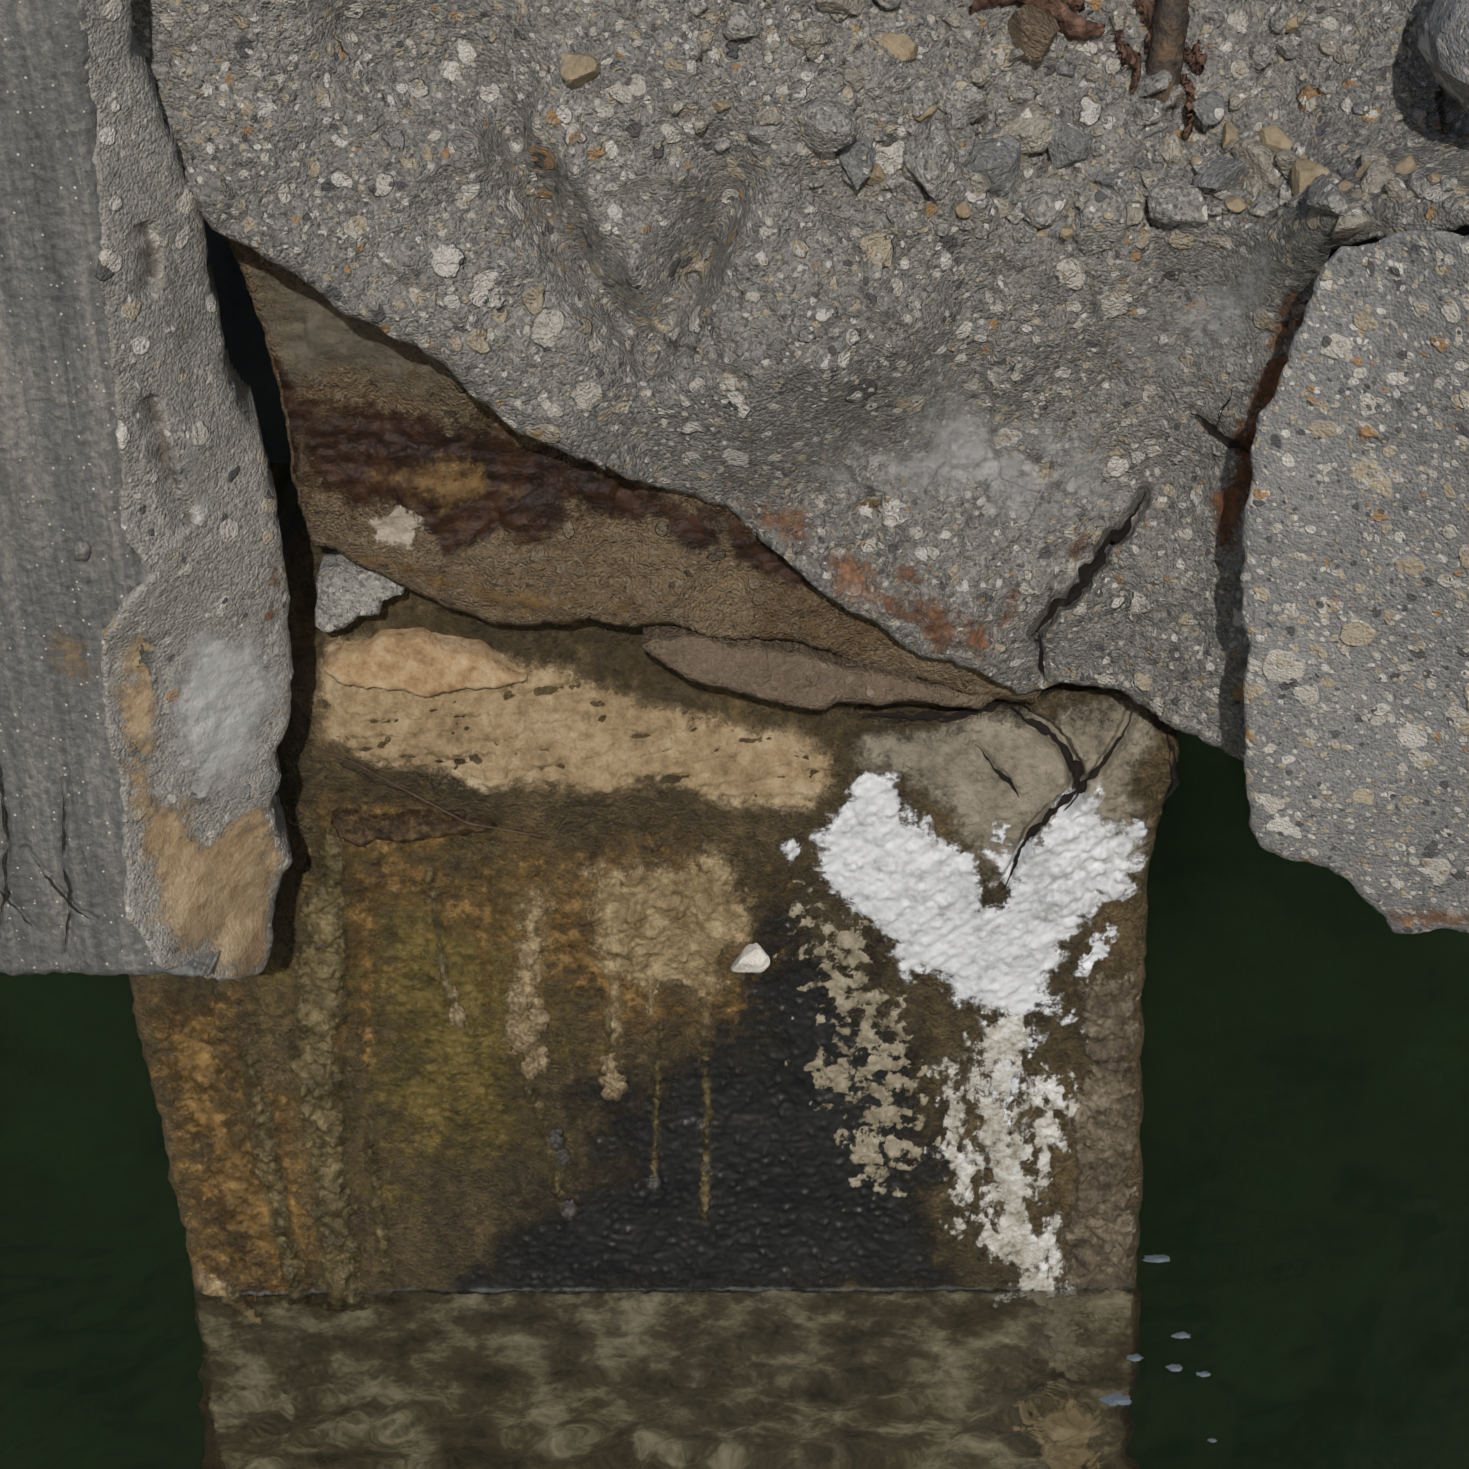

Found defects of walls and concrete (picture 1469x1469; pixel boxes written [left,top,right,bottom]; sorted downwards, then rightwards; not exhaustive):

spalling [77,0,1043,981]
crack [1191,389,1250,453]
corrosion [1212,293,1309,549]
corrosion [829,555,1019,657]
crack [1035,491,1146,684]
crack [0,768,94,955]